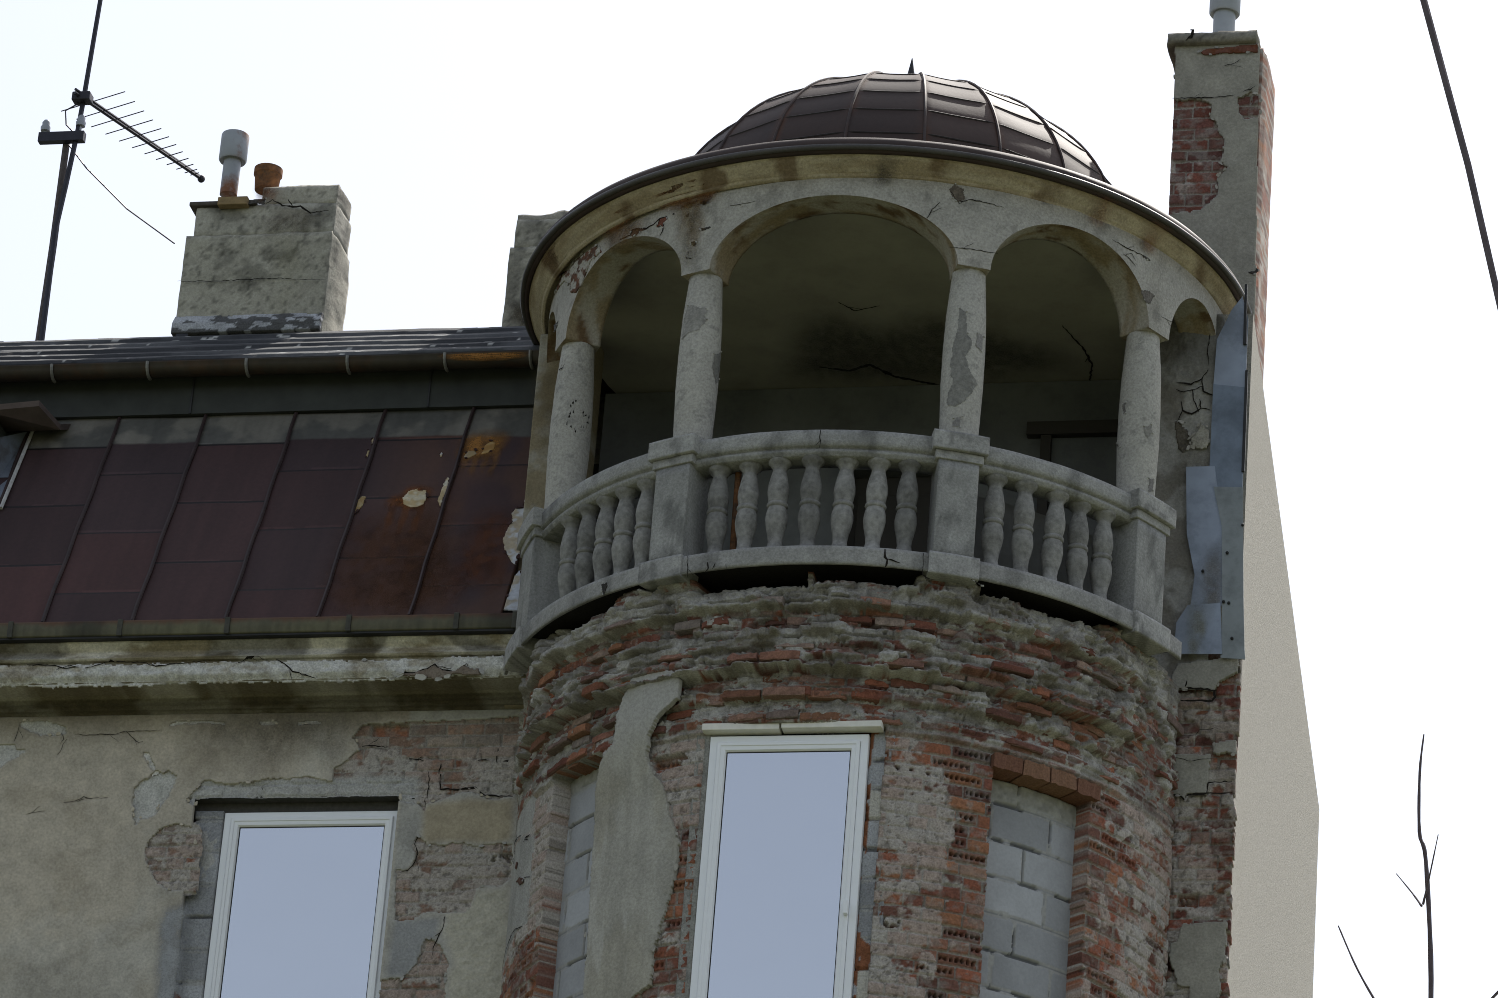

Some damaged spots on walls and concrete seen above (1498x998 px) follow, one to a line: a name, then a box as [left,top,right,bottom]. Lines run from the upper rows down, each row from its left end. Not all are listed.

flaking render [1169,100,1227,215]
flaking render [554,244,602,294]
flaking render [947,307,978,428]
crack [1176,335,1213,423]
peeling [402,477,449,508]
peeling [503,500,525,611]
flaking render [20,719,67,736]
flaking render [131,717,522,896]
flaking render [391,834,524,921]
flaking render [583,670,686,998]
flaking render [379,936,449,998]
flaking render [1167,919,1228,998]